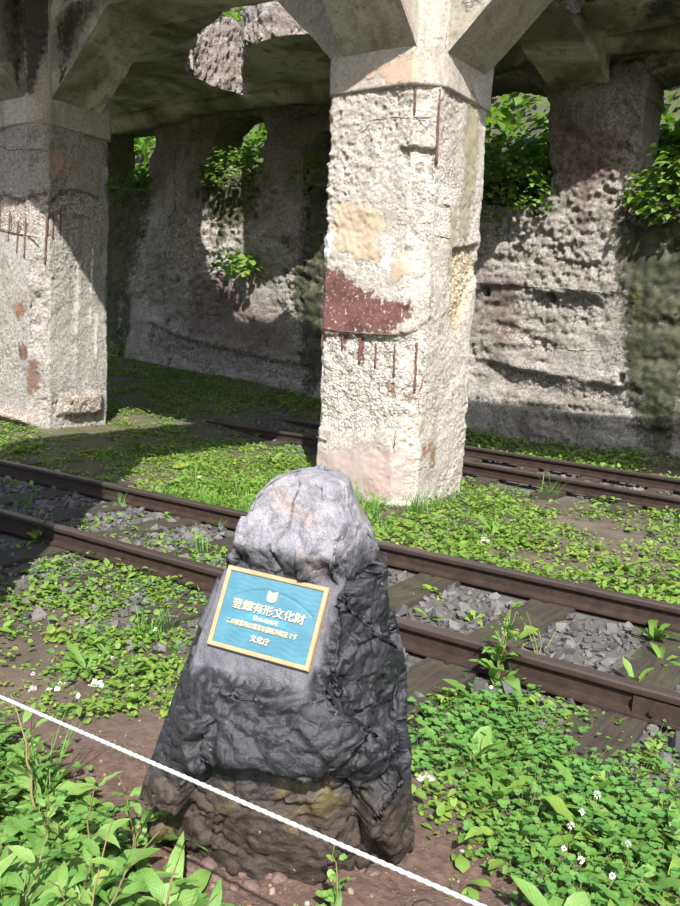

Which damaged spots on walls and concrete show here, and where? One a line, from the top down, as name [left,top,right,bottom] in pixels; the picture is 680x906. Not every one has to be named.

leakage [4,0,93,94]
rust [18,344,40,394]
spalling [148,53,475,500]
rust [322,201,413,364]
leakage [613,199,680,456]